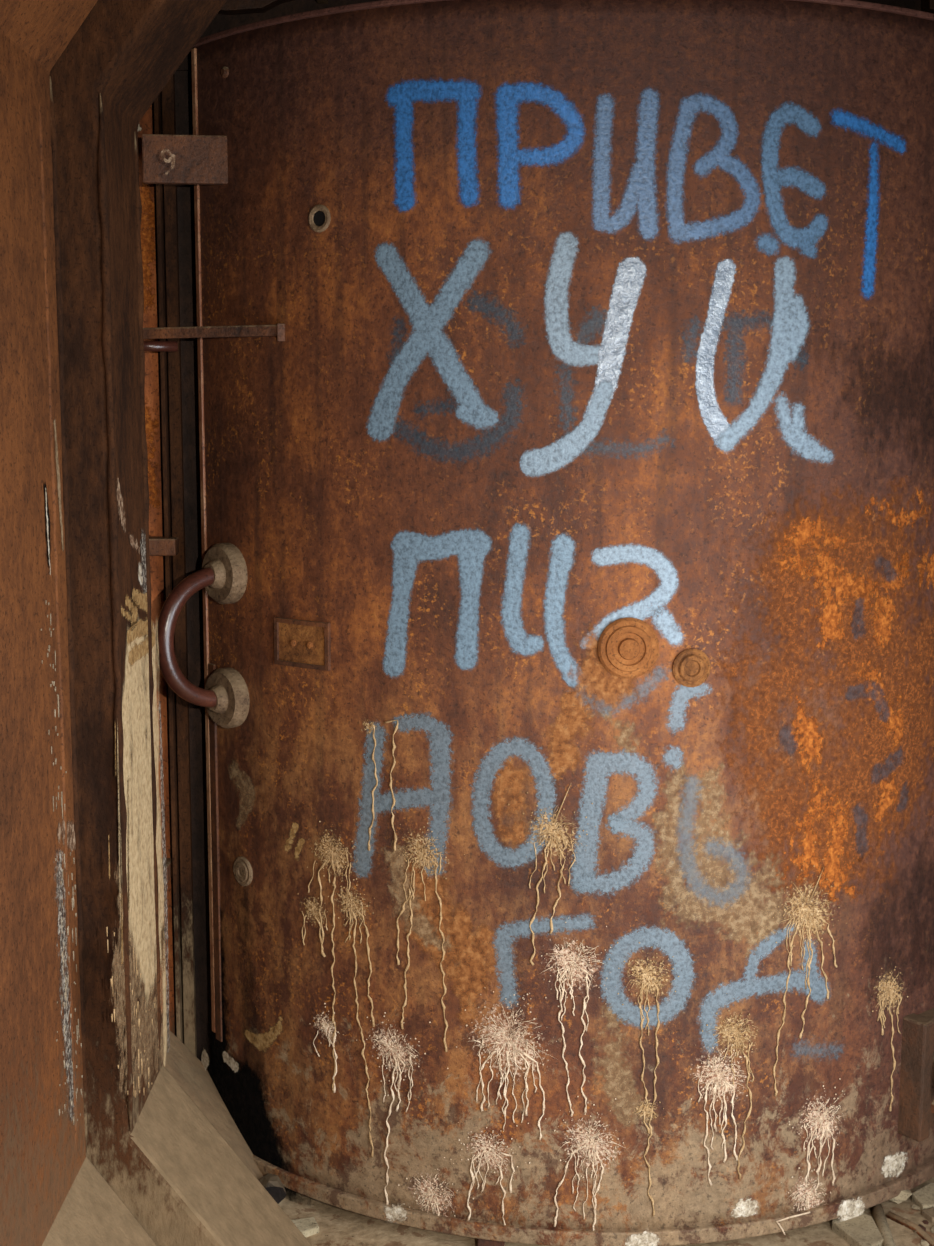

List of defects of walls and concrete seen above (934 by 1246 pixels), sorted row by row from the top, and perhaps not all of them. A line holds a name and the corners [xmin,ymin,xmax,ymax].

corrosion [139,184,156,312]
corrosion [145,403,160,509]
corrosion [547,627,652,778]
corrosion [717,478,934,904]
corrosion [493,755,527,842]
peeling [113,625,168,1095]
corrosion [385,841,503,1024]
damp [384,1204,407,1222]
damp [731,1199,758,1218]
damp [837,1197,865,1223]
damp [881,1152,907,1178]